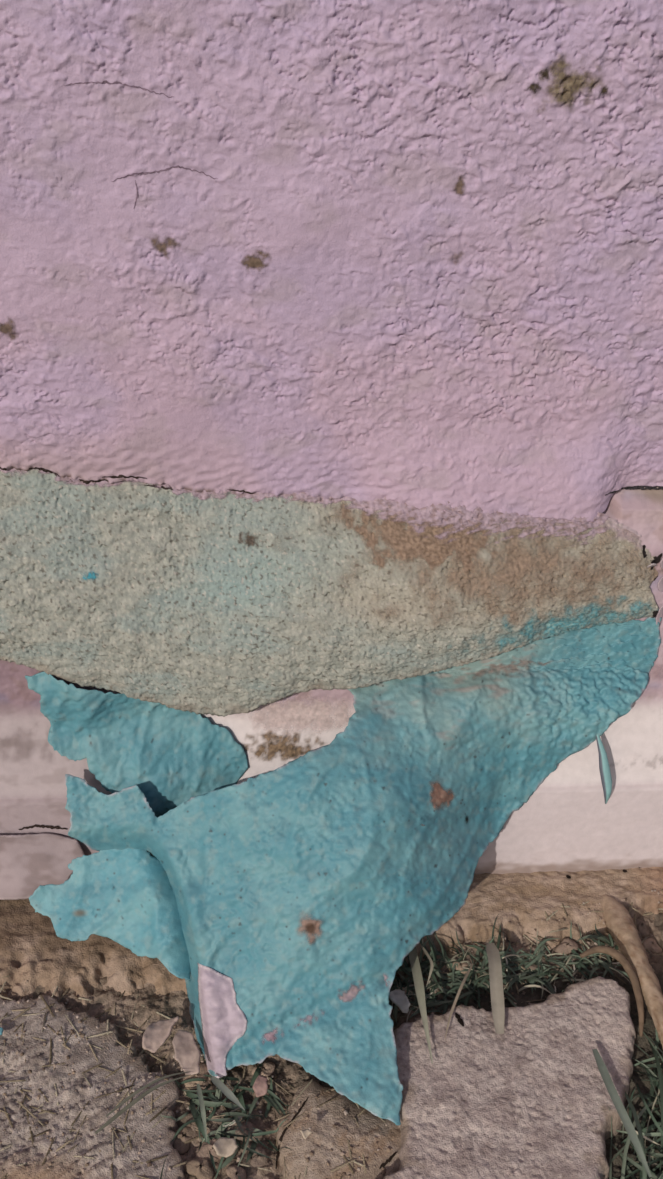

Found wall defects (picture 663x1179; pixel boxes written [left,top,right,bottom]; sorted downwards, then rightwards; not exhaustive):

crack [0,467,181,491]
peeling [0,469,662,1125]